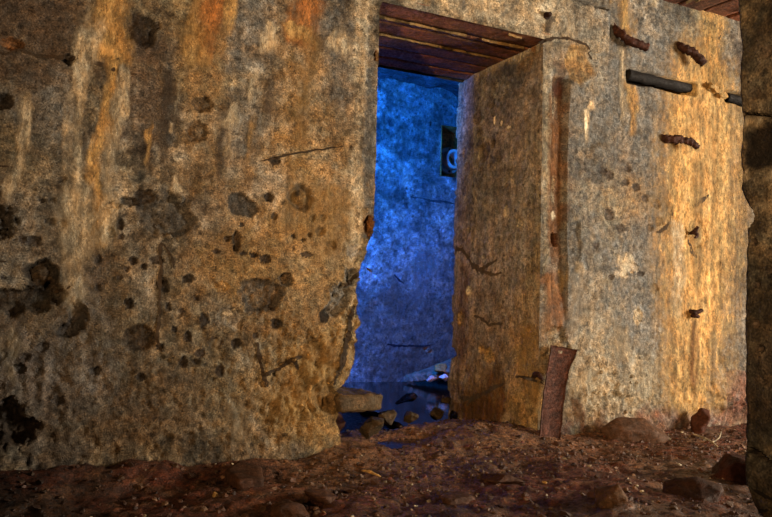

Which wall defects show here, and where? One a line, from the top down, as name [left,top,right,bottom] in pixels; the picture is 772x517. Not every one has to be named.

rust [189,0,237,63]
crack [538,36,592,60]
rust [612,23,650,52]
damp [745,118,763,126]
crack [263,146,343,161]
spalling [0,205,43,247]
rust [659,11,739,413]
crack [455,246,502,276]
spalling [0,257,90,338]
spalling [265,267,360,416]
rust [536,345,584,439]
crack [747,447,772,463]